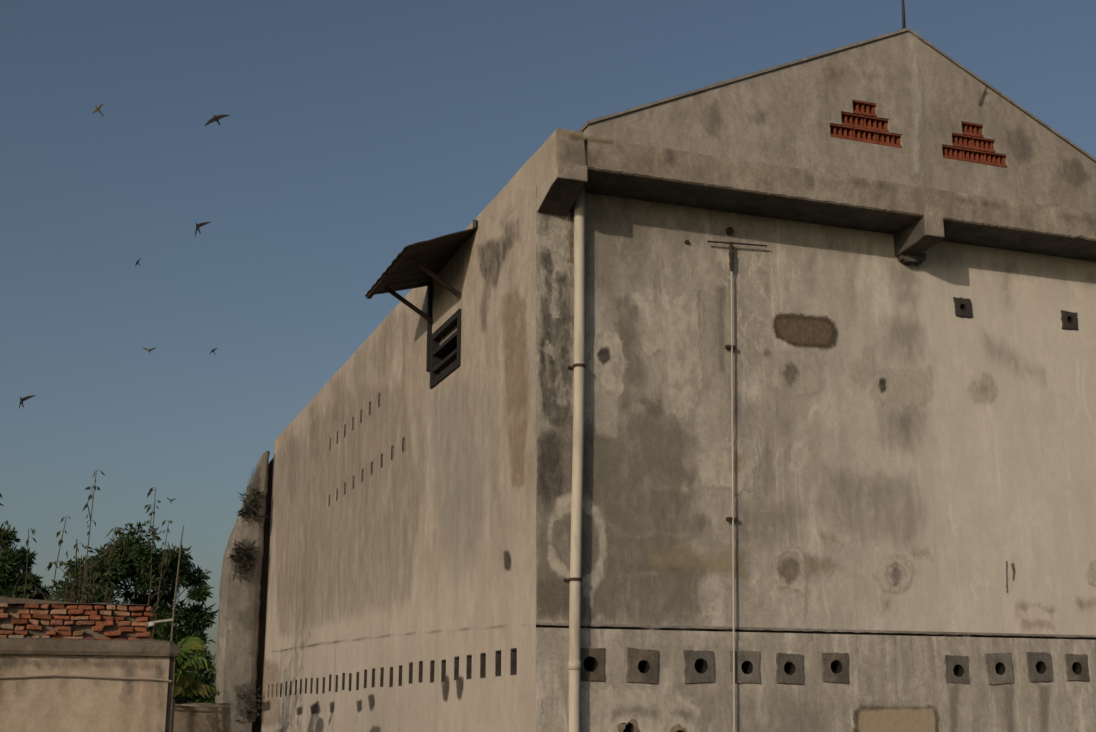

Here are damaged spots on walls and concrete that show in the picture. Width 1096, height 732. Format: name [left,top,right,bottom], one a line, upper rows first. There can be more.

leakage [537,253,700,623]
peeling [580,638,702,732]